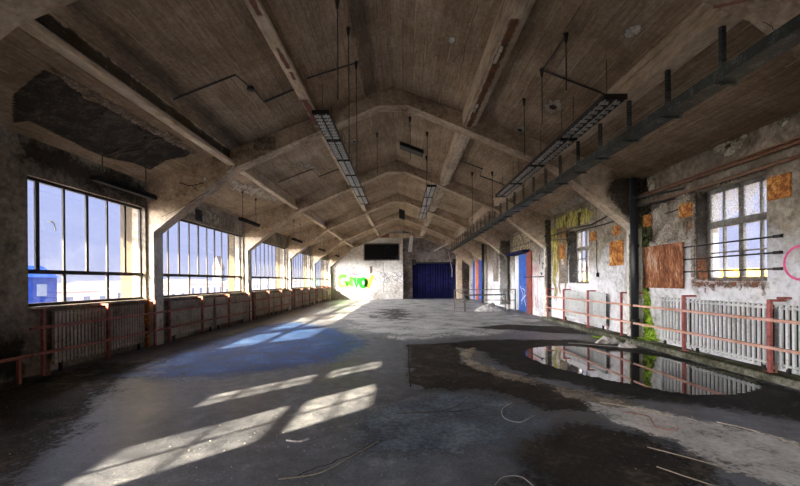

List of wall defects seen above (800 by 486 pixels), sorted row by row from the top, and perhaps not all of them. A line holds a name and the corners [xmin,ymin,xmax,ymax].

spalling [12,69,197,169]